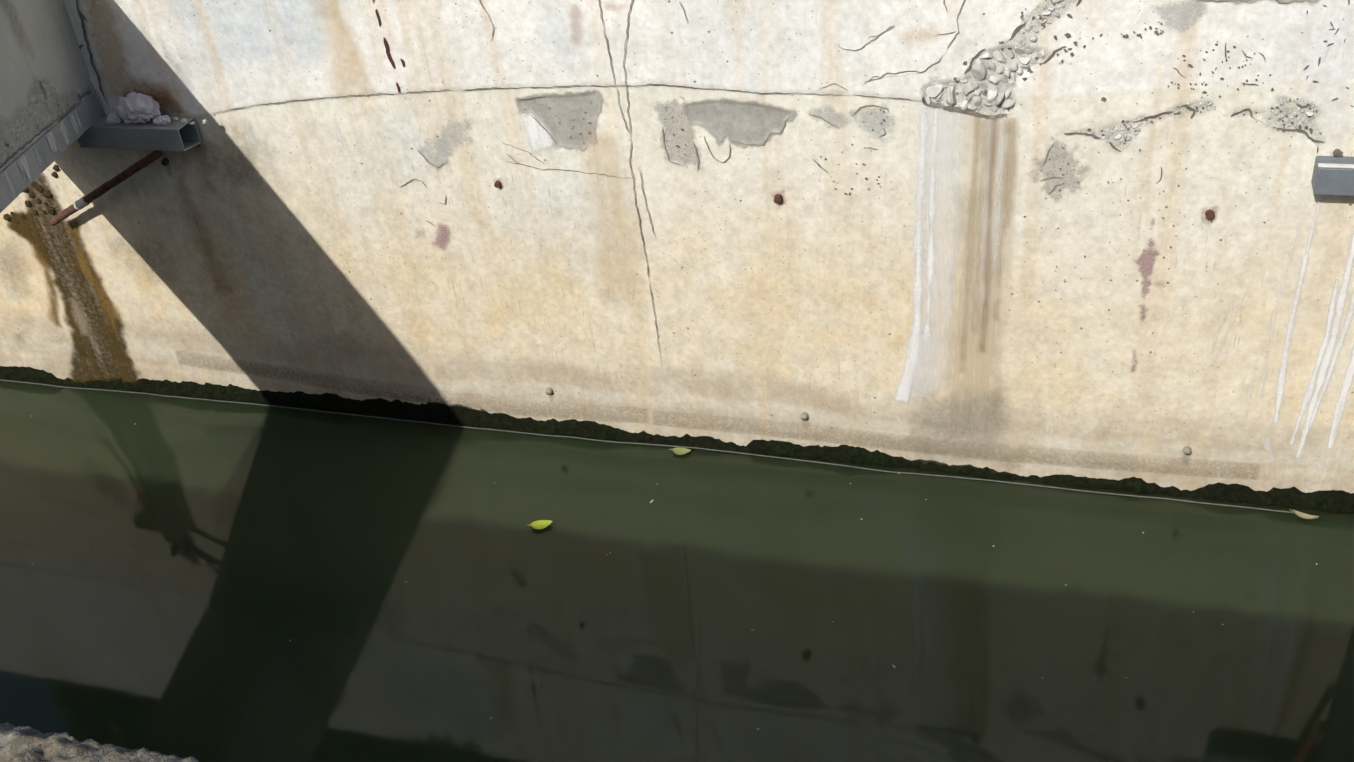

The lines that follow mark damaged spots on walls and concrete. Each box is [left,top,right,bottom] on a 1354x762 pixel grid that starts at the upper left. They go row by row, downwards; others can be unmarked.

rust [49,150,163,226]
spalling [516,91,602,151]
crack [201,0,965,367]
spalling [657,96,888,195]
spalling [1018,0,1102,64]
spalling [1167,43,1274,113]
spalling [1243,98,1321,134]
peeling [1276,0,1346,82]
leakage [895,108,1014,431]
leakage [1274,201,1320,424]
leakage [1289,234,1354,458]